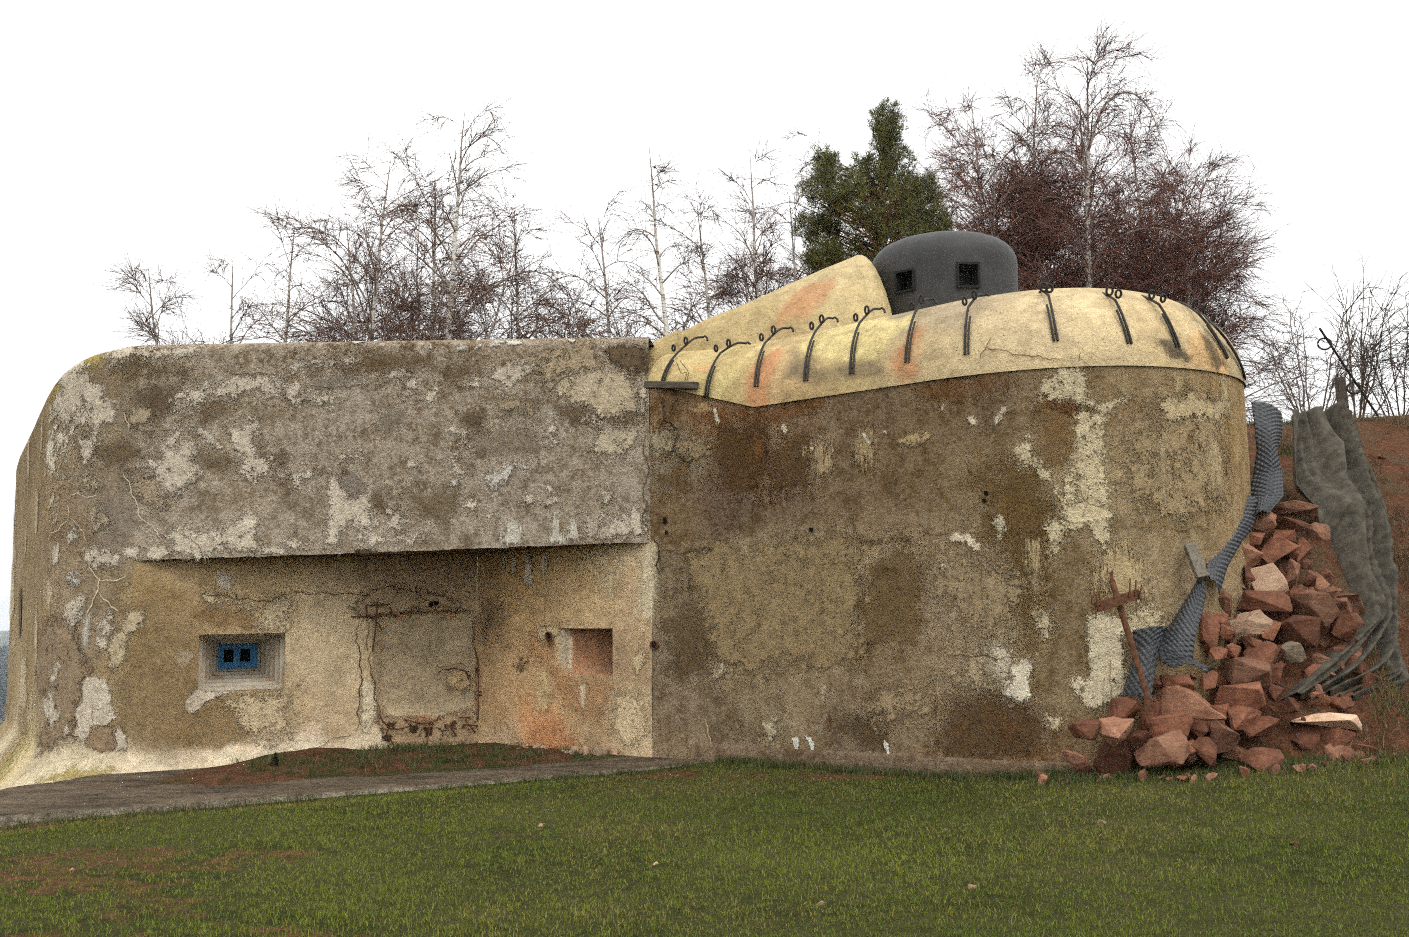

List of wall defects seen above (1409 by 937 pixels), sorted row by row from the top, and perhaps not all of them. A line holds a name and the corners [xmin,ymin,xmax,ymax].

crack [979,338,1081,360]
damp [707,408,887,490]
peeling [41,592,147,752]
crack [48,474,203,617]
spalling [348,584,462,652]
spalling [358,616,482,747]
crack [642,396,900,666]
damp [859,534,946,649]
peeling [912,366,1234,714]